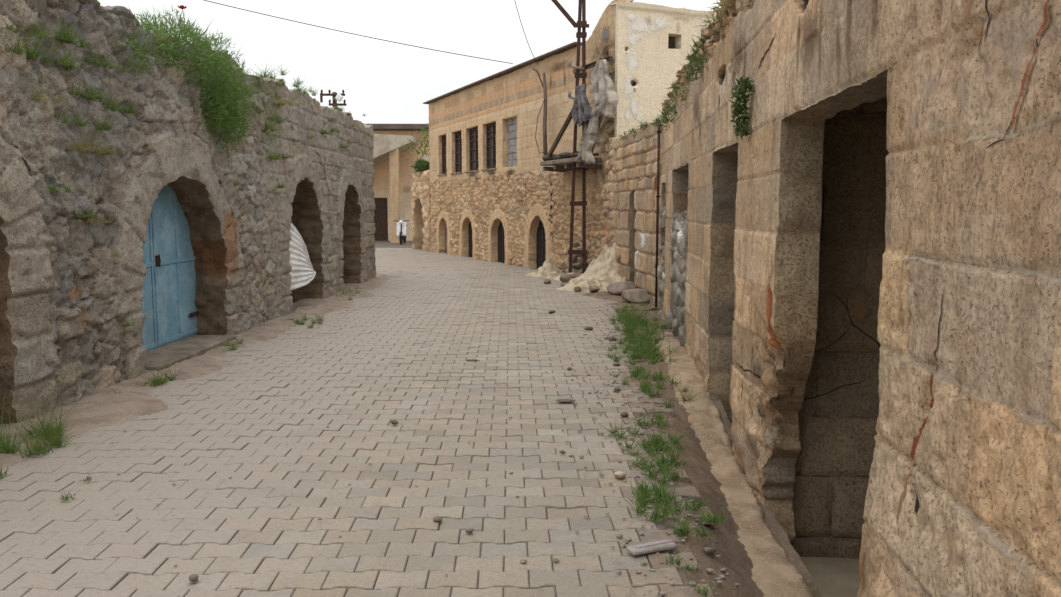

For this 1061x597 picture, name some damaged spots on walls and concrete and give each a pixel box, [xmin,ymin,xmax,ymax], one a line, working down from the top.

crack [984,0,1051,148]
crack [814,292,880,353]
crack [896,293,943,523]